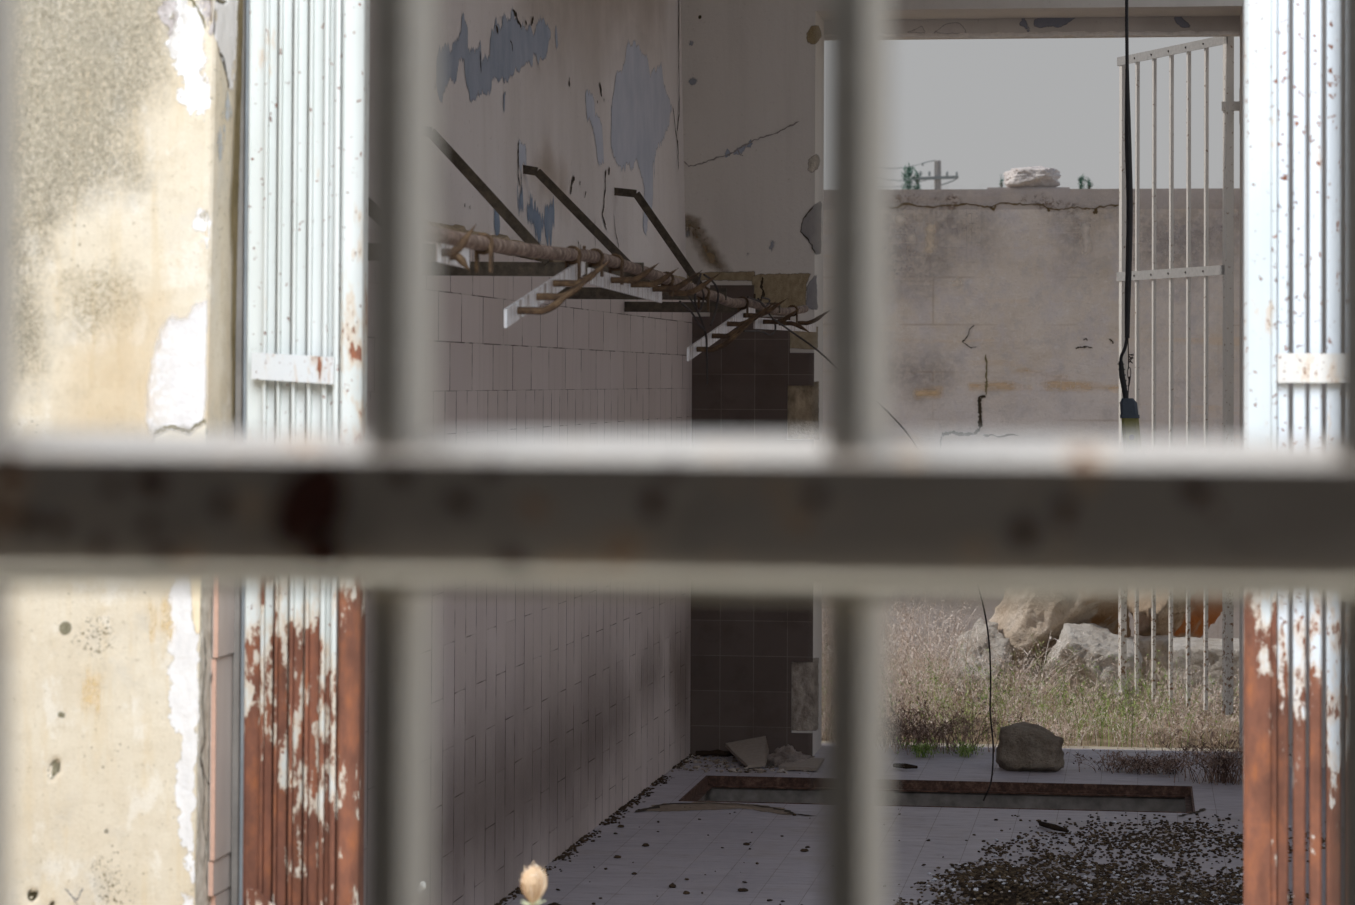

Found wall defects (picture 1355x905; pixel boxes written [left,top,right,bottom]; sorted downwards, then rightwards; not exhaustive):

flaking render [157,0,238,162]
peeling [438,7,558,111]
peeling [585,39,672,233]
crack [673,80,799,170]
peeling [517,185,555,246]
flaking render [800,202,822,254]
crack [890,202,1135,214]
peeling [687,271,818,315]
flaking render [147,301,207,430]
crack [942,325,1018,436]
rust [274,461,346,570]
flaking render [167,588,219,905]